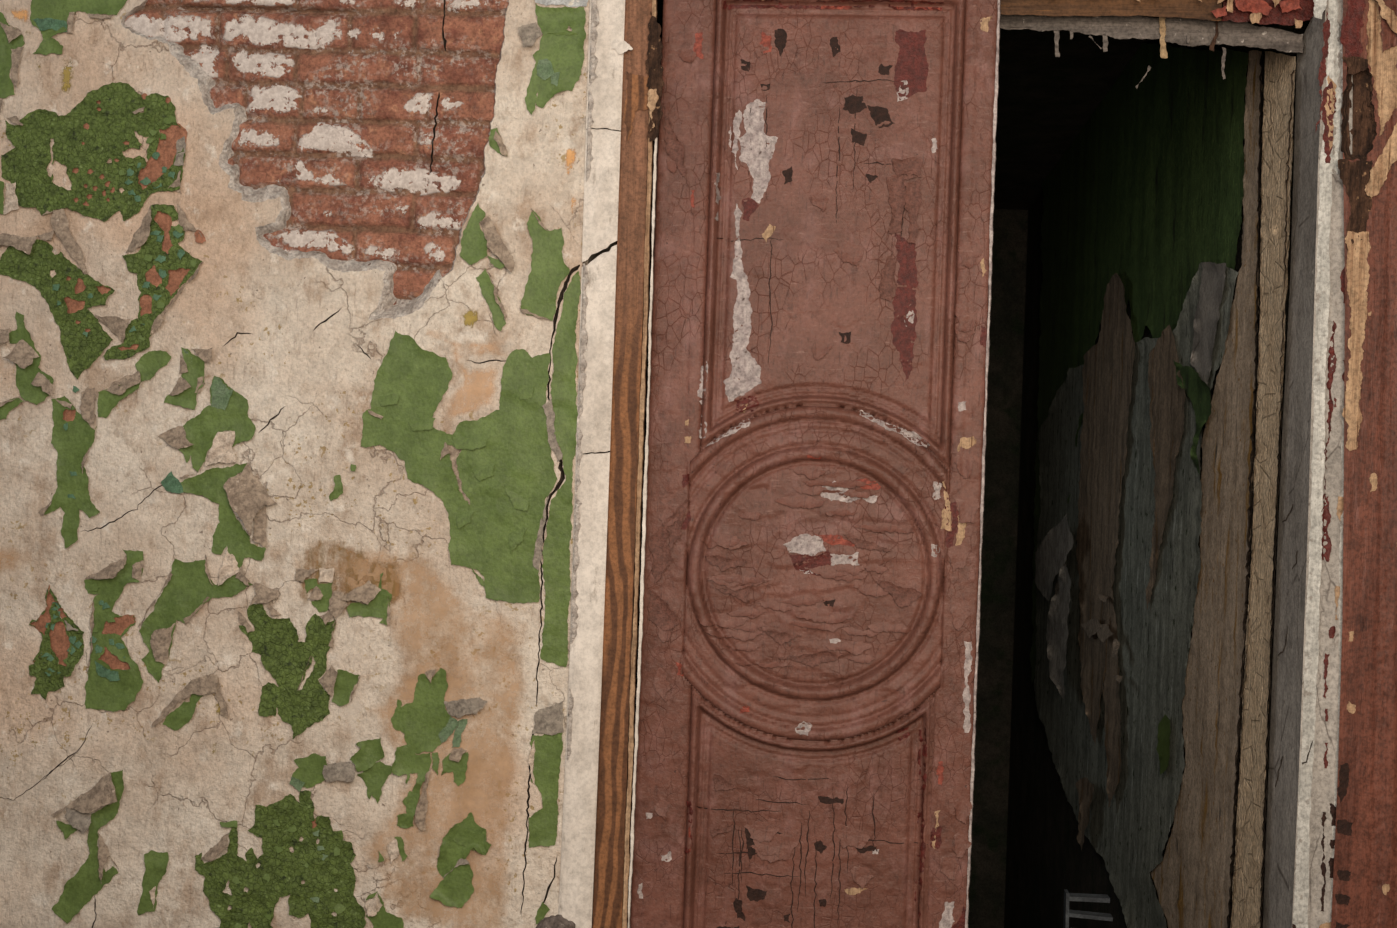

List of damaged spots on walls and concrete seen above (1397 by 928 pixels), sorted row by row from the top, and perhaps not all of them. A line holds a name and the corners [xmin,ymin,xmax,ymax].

crack [428,93,440,181]
crack [440,0,448,51]
flaking render [0,0,588,739]
crack [547,265,580,400]
peeling [684,99,778,448]
peeling [1030,43,1249,928]
crack [0,723,93,801]
peeling [52,770,124,924]
peeling [195,668,491,928]
leakage [349,555,519,921]
crack [521,459,565,911]
peeling [528,701,564,848]